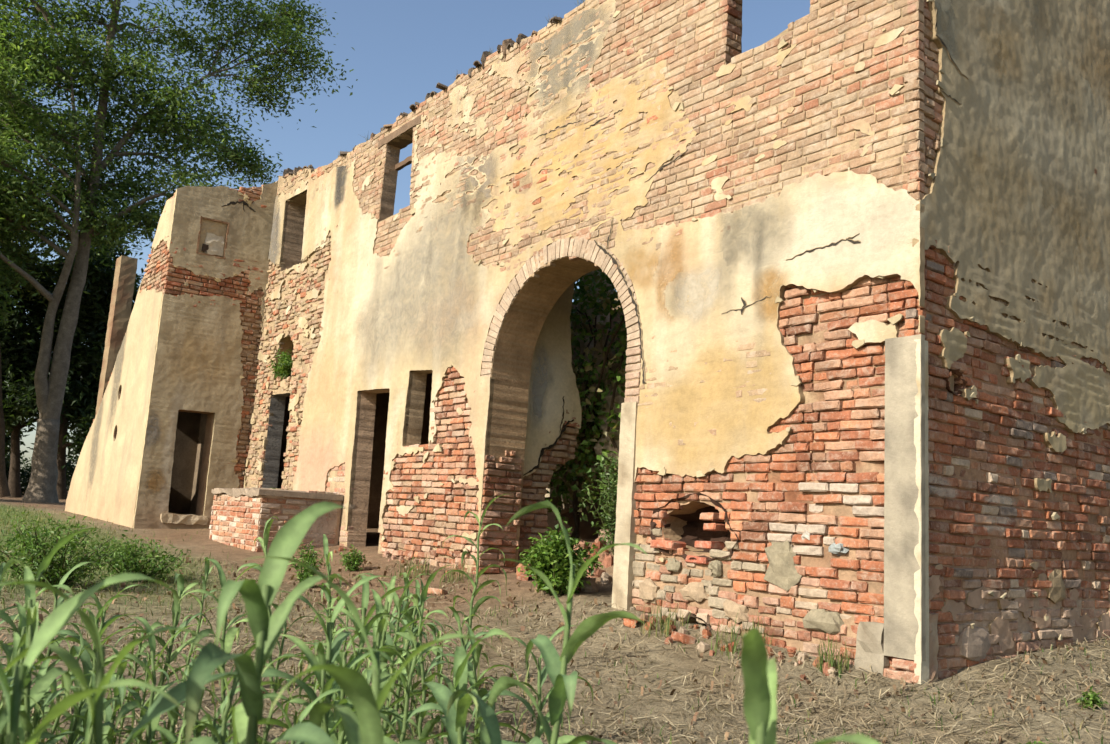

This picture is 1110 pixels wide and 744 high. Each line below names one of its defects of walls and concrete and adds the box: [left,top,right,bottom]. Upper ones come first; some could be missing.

spalling [139,225,338,490]
spalling [230,184,267,208]
spalling [379,365,580,574]
spalling [277,0,949,279]
crack [721,295,772,315]
crack [786,233,861,260]
spalling [625,240,1110,679]